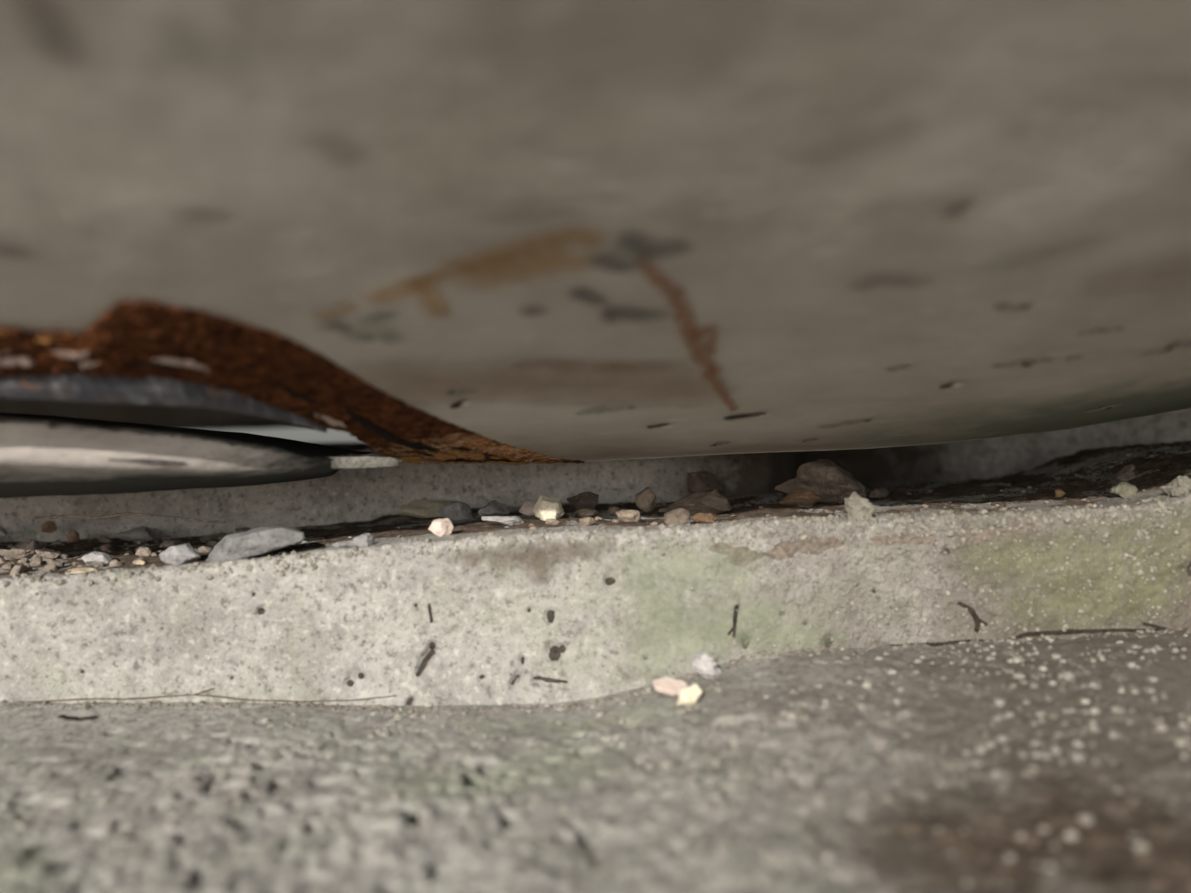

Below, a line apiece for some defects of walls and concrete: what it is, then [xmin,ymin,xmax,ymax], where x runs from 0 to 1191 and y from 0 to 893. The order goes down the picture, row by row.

rust [637,259,737,412]